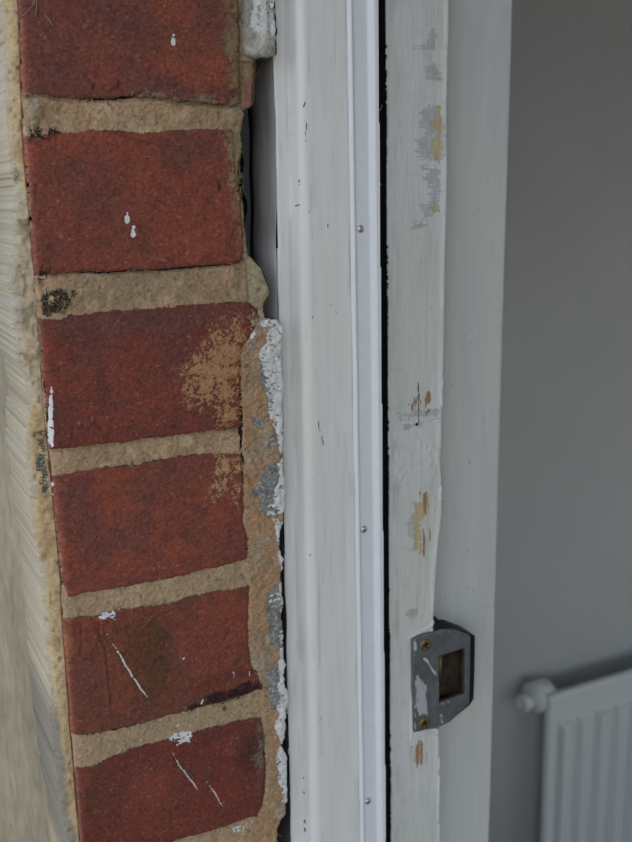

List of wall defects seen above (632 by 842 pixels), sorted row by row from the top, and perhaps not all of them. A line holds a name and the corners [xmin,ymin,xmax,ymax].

peeling [249,0,276,36]
peeling [413,24,442,83]
peeling [411,104,447,230]
peeling [396,382,442,431]
peeling [248,319,286,571]
peeling [407,491,431,556]
peeling [265,582,289,804]